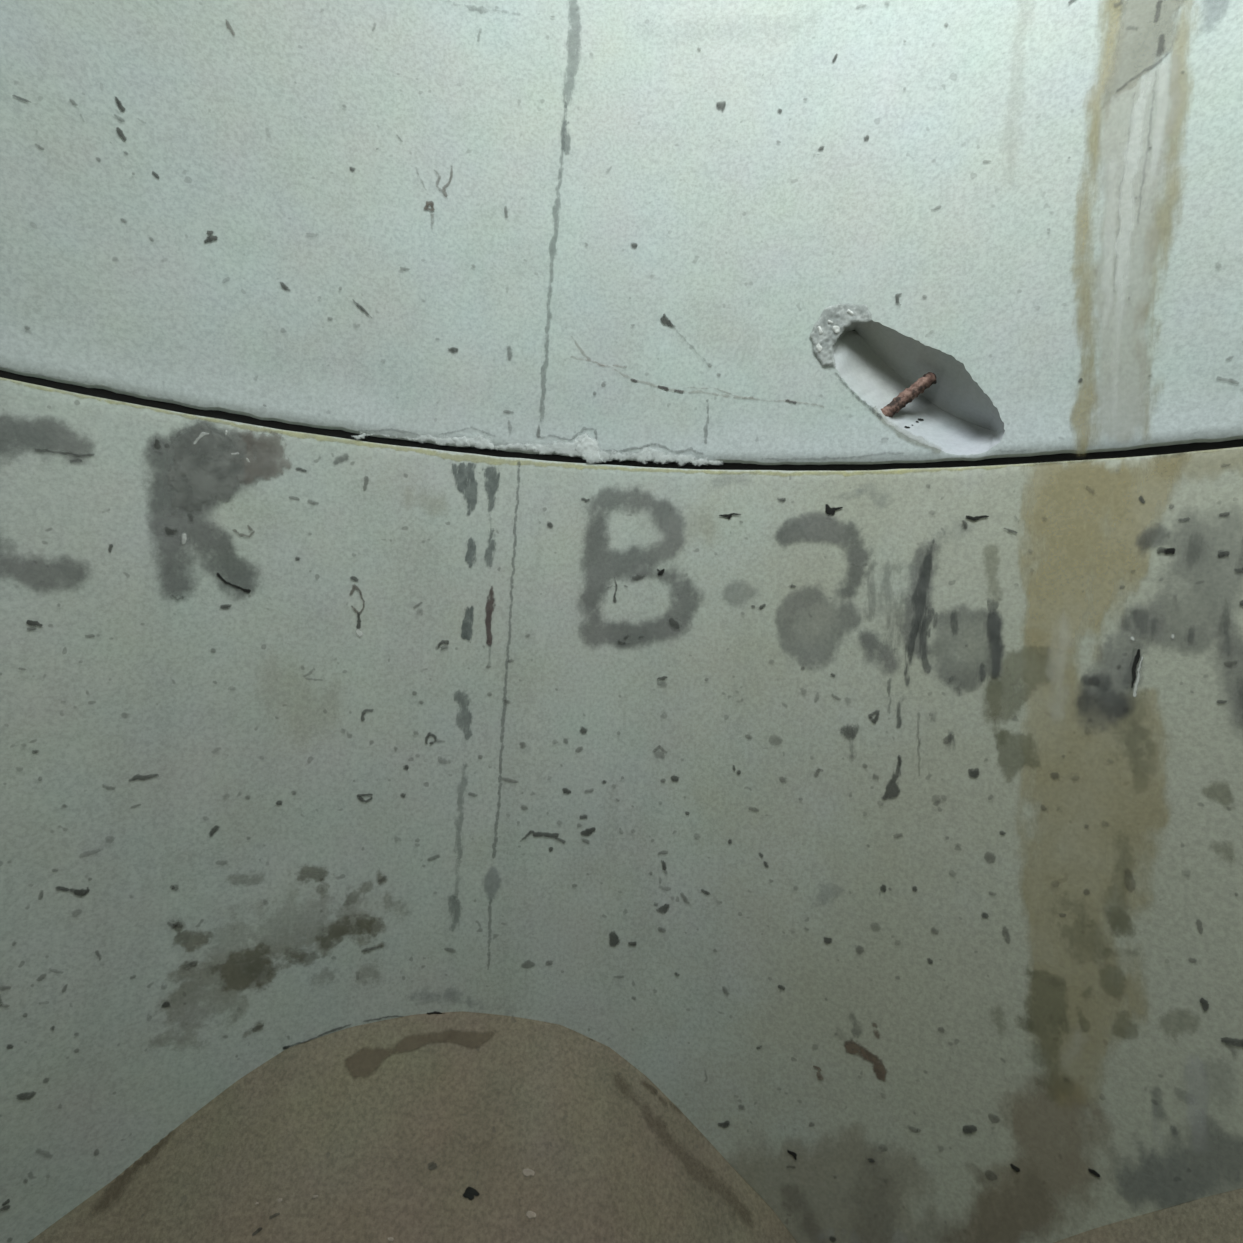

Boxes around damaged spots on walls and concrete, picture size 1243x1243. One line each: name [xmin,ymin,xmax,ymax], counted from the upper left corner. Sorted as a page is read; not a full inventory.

corrosion [881,372,937,417]
water stain [1022,454,1182,655]